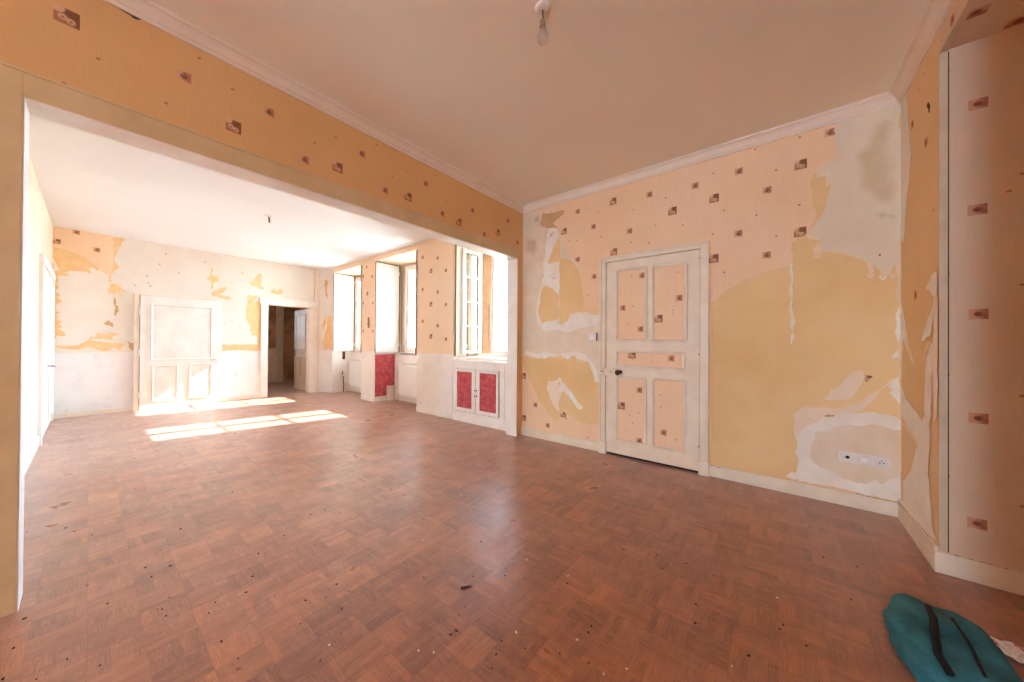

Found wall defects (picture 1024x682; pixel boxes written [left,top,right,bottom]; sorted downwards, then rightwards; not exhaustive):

flaking render [806,104,901,306]
leakage [851,117,901,223]
peeling [88,297,134,351]
peeling [211,287,232,305]
peeling [250,274,264,290]
flaking render [522,211,599,380]
flaking render [786,343,936,540]